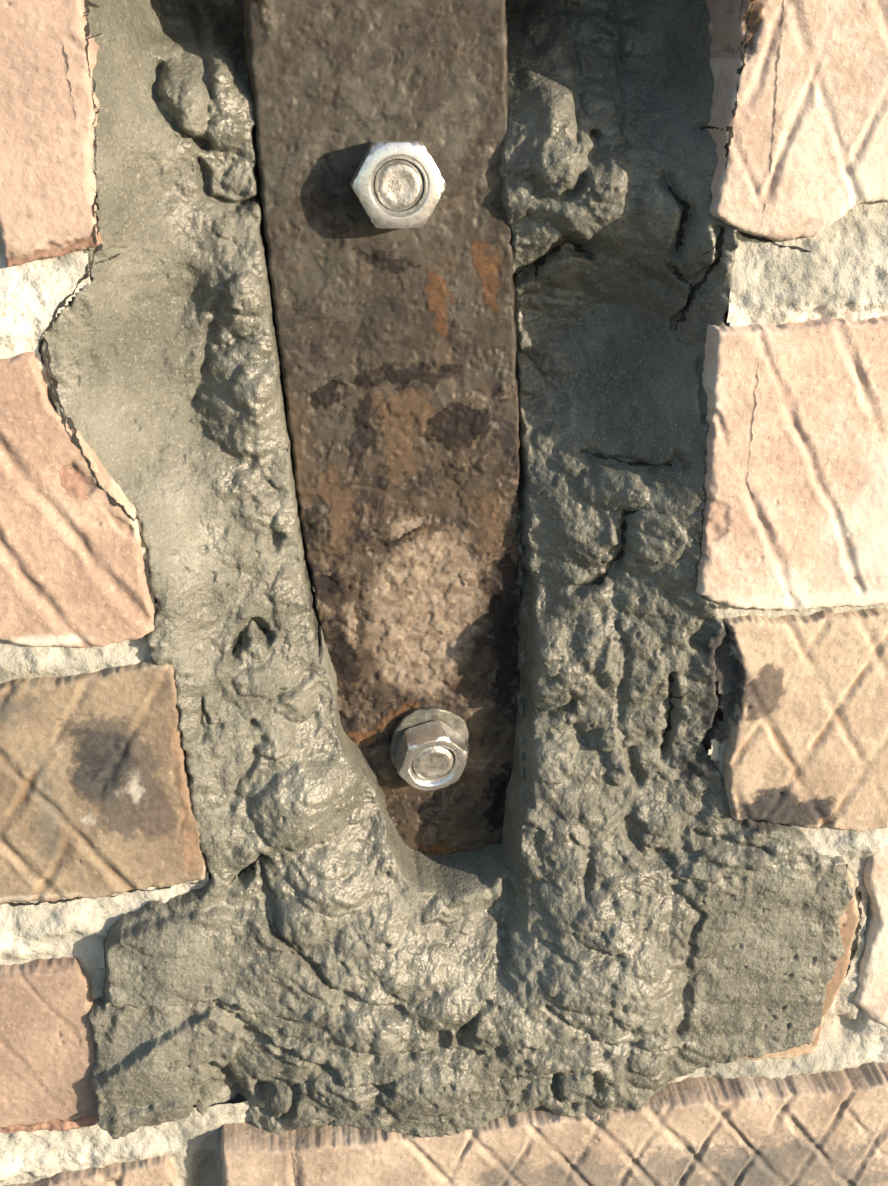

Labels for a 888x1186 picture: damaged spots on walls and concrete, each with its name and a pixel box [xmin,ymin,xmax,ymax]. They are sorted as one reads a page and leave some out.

crack [665,0,811,331]
corrosion [424,267,455,338]
corrosion [470,237,503,311]
corrosion [371,385,436,488]
crack [581,451,674,467]
corrosion [315,462,358,544]
crack [578,510,638,586]
corrosion [346,700,424,747]
crack [660,673,690,763]